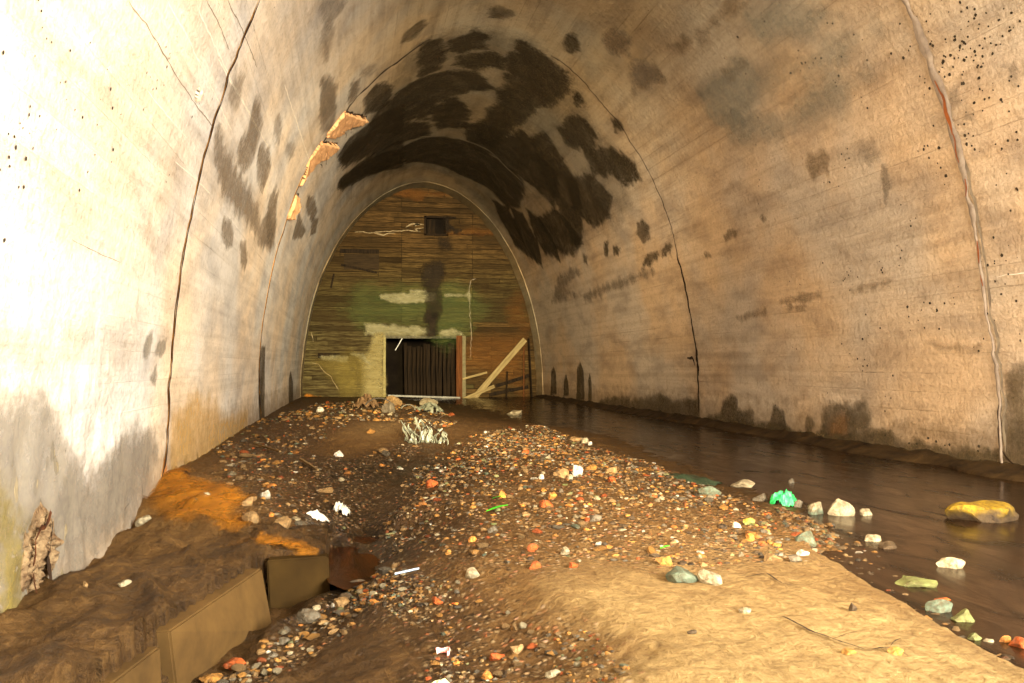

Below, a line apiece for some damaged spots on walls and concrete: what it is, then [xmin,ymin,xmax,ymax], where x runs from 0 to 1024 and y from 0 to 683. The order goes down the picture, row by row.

crack [125,0,270,509]
damp [215,101,278,268]
damp [293,196,318,239]
damp [320,80,336,131]
spalling [287,111,369,220]
damp [337,21,670,300]
crack [553,57,699,412]
corrosion [934,81,959,163]
damp [322,261,462,397]
damp [550,363,1024,466]
spalling [19,502,64,593]
damp [0,395,158,614]